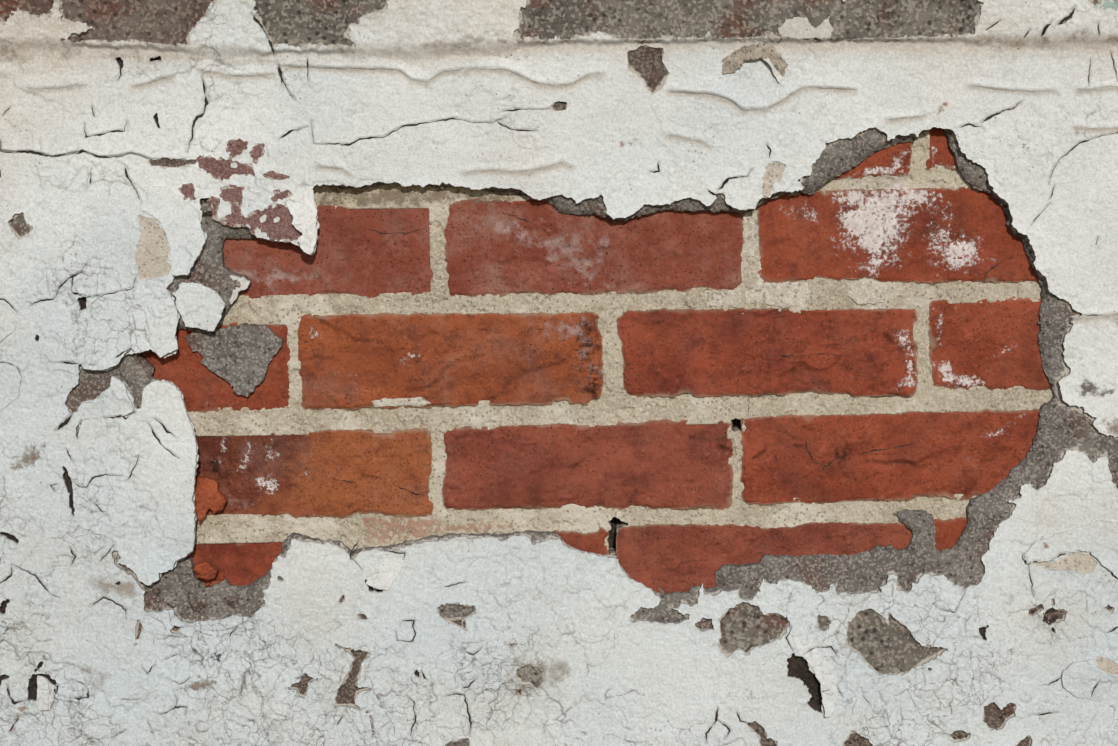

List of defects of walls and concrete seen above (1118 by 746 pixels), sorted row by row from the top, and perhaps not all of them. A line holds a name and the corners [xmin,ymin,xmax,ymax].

peeling [0,0,217,47]
peeling [514,0,983,95]
crack [1024,8,1117,83]
crack [0,106,147,198]
crack [186,78,208,153]
crack [281,108,549,146]
leakage [831,151,980,278]
crack [50,415,138,513]
peeling [64,139,630,645]
flaking render [412,127,1118,717]
peeling [289,673,318,697]
peeling [334,644,374,728]